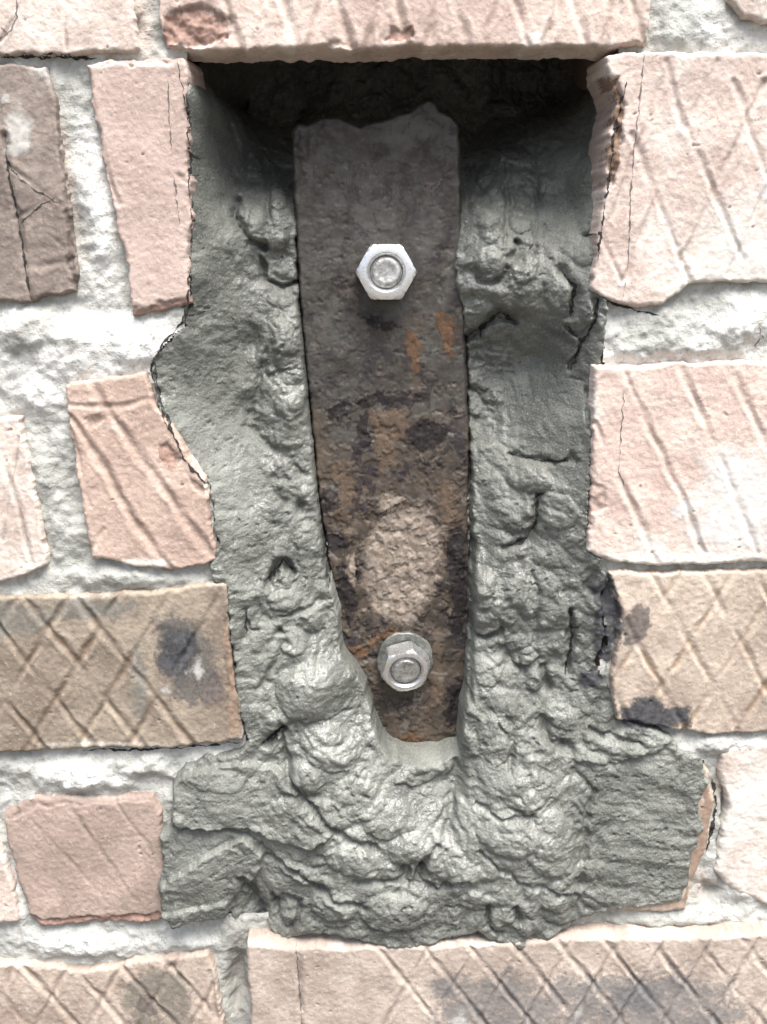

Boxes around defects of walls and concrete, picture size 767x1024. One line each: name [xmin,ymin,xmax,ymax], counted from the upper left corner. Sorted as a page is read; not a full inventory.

crack [562,56,657,369]
corrosion [329,457,358,513]
corrosion [368,406,411,475]
crack [509,454,569,462]
crack [507,492,545,546]
corrosion [347,626,402,658]
crack [565,608,583,673]
corrosion [395,733,426,743]